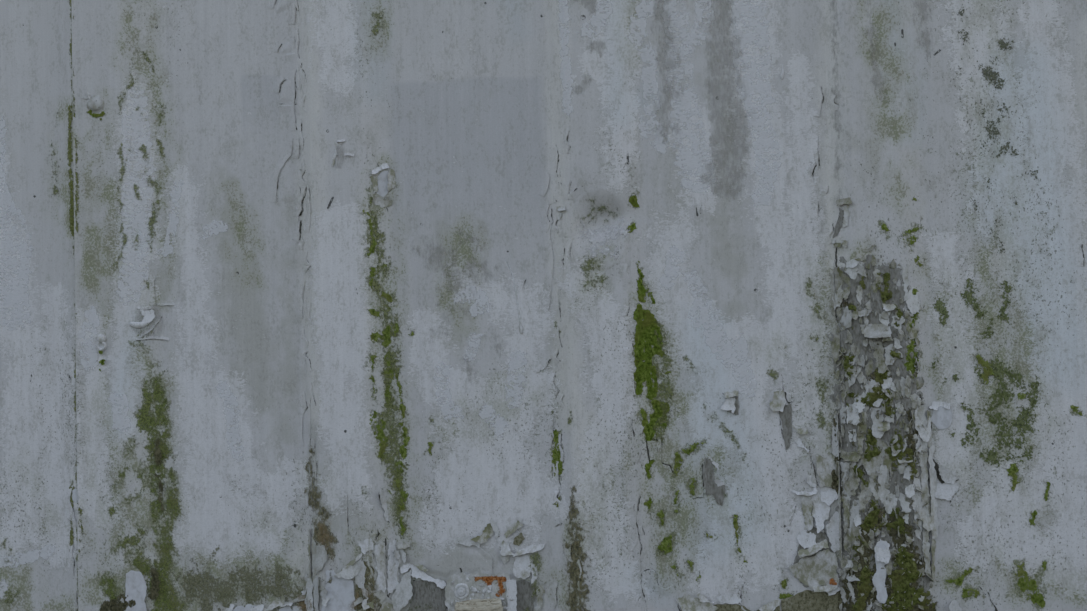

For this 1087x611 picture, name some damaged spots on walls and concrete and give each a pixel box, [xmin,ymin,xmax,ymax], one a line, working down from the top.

peeling [129,275,175,341]
crack [266,0,320,587]
peeling [675,197,962,611]
peeling [120,570,147,611]
rust [474,576,506,597]
peeling [453,514,546,611]